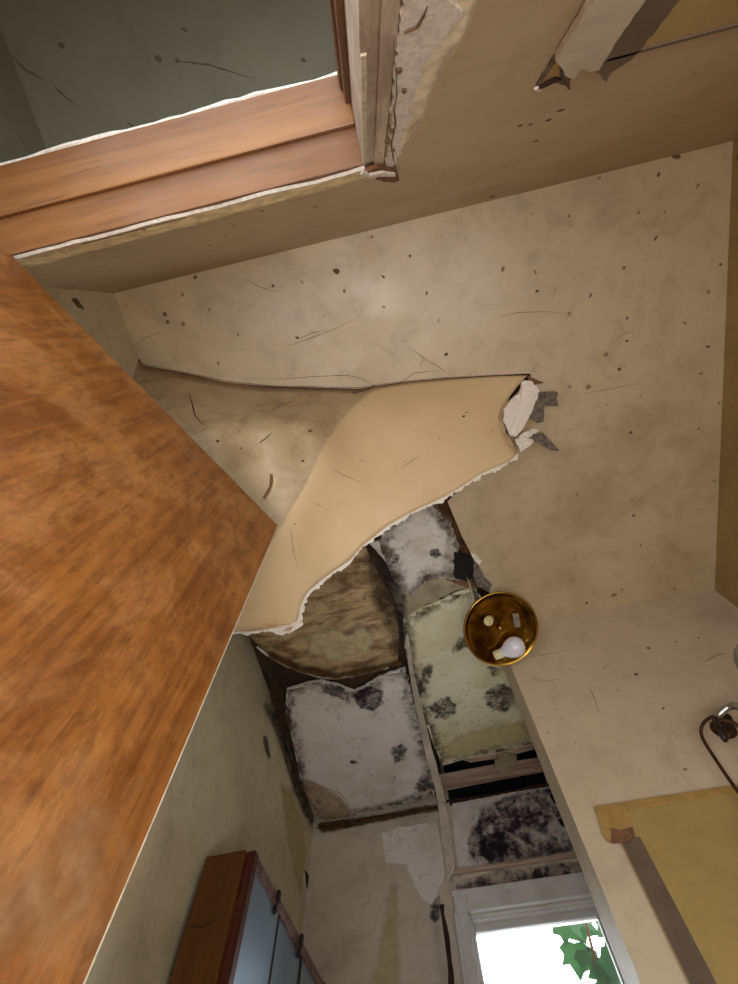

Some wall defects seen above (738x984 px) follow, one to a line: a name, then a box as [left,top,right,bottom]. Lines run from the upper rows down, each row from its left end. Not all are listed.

spalling [534,53,571,92]
spalling [0,0,463,260]
damp [435,503,470,554]
damp [248,546,438,832]
mould [428,697,456,718]
mould [486,666,514,712]
peeling [452,787,574,868]
mould [467,788,582,882]
peeling [381,821,445,905]
mould [459,876,494,889]
damp [430,898,440,922]